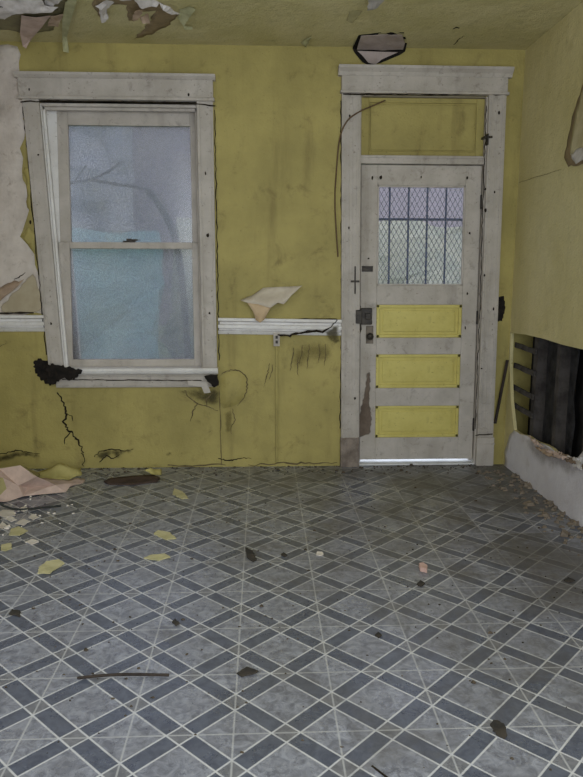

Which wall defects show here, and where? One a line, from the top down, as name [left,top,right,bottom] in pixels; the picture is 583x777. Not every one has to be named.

peeling [92,0,195,38]
flaking render [353,32,407,65]
flaking render [0,0,77,315]
crack [0,100,220,360]
peeling [241,286,301,322]
crack [57,379,201,465]
spalling [504,336,583,527]